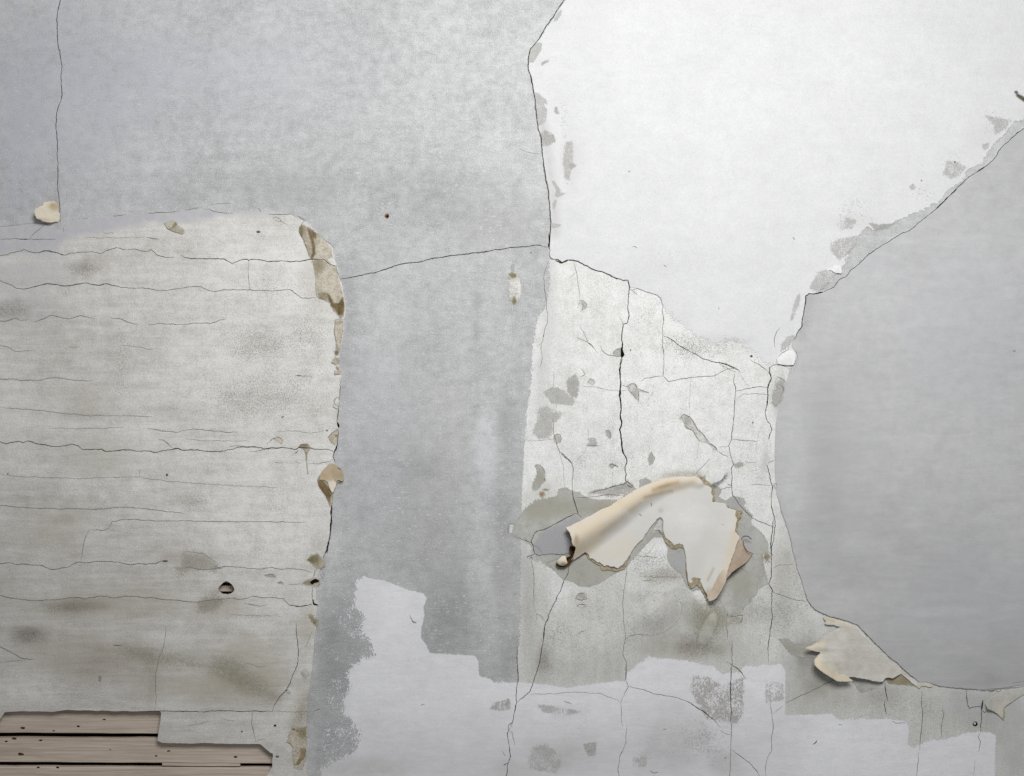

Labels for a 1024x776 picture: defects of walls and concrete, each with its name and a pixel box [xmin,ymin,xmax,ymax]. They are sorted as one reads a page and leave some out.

crack [55,0,63,208]
peeling [34,201,60,223]
crack [0,280,127,289]
spalling [298,221,344,375]
crack [86,0,917,680]
crack [795,129,1023,338]
crack [0,501,333,741]
crack [1,386,341,488]
spalling [317,463,344,506]
peeling [508,464,772,625]
crack [502,423,833,776]
peeling [779,617,933,693]